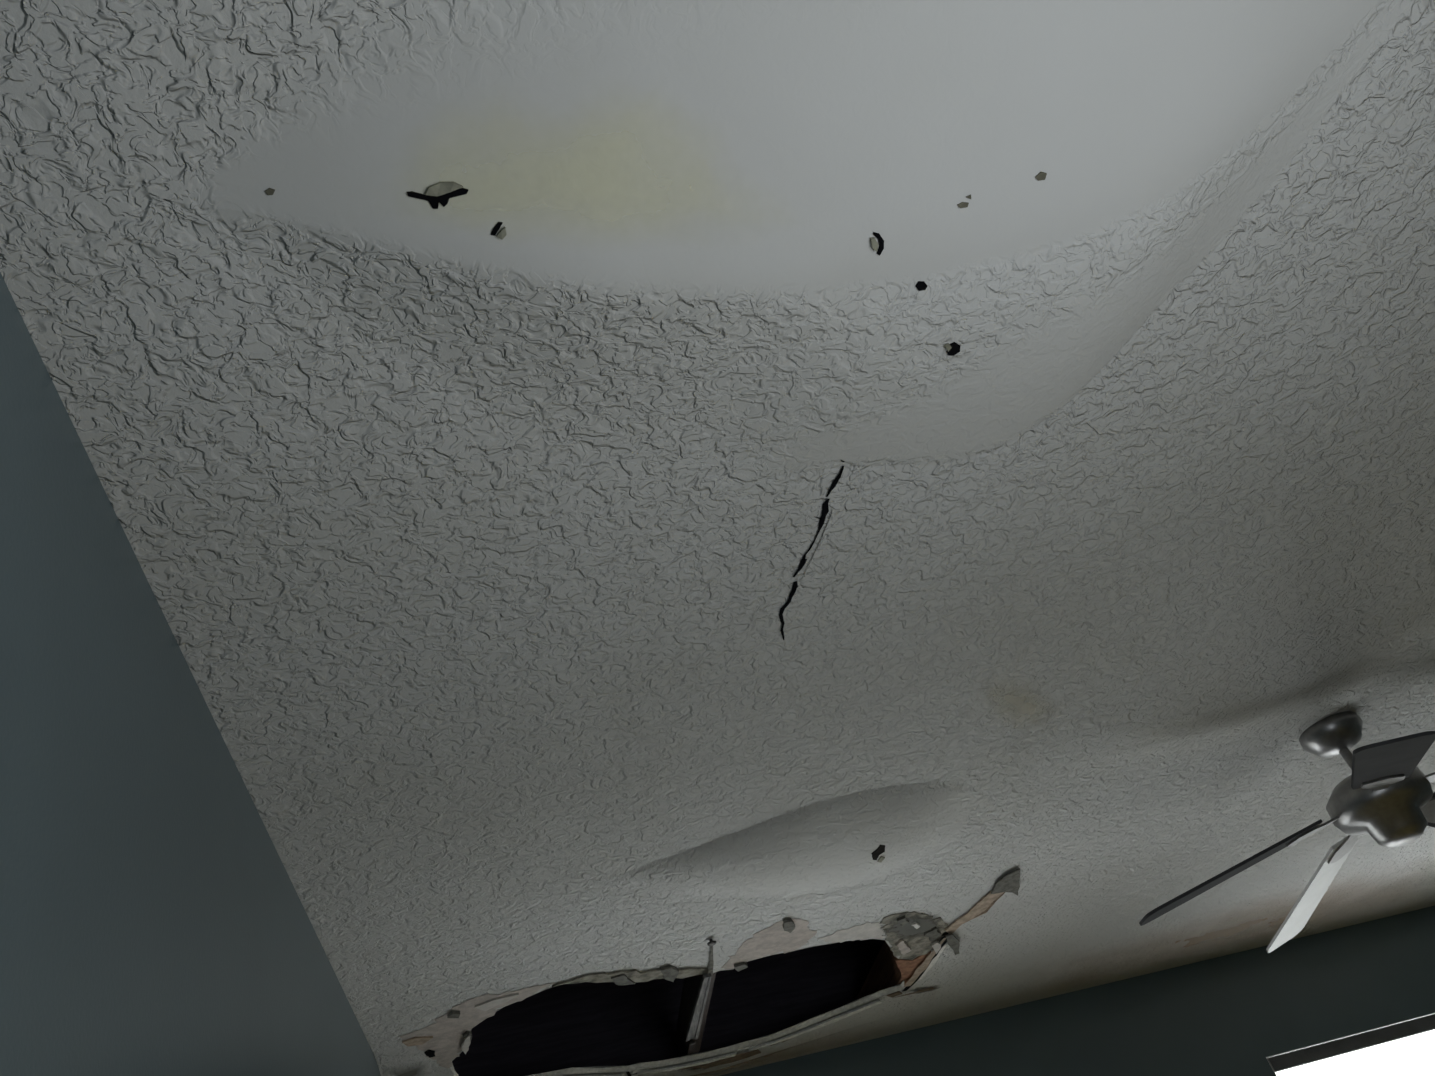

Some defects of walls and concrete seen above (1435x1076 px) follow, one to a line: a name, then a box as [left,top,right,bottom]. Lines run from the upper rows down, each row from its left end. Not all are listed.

crack [779,460,845,640]
peeling [399,983,554,1069]